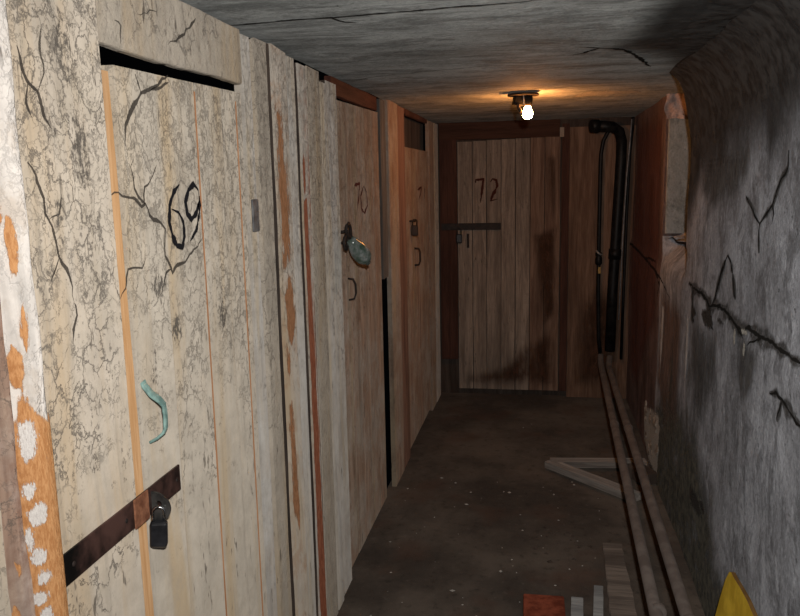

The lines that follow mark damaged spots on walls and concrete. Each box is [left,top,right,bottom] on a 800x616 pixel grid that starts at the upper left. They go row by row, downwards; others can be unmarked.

crack [16,25,52,129]
crack [169,18,196,43]
crack [574,47,651,67]
peeling [0,214,18,275]
crack [27,162,78,342]
crack [120,262,145,299]
crack [112,74,204,293]
crack [688,254,800,367]
crack [746,150,789,253]
crack [769,388,800,428]
peeling [6,306,69,616]